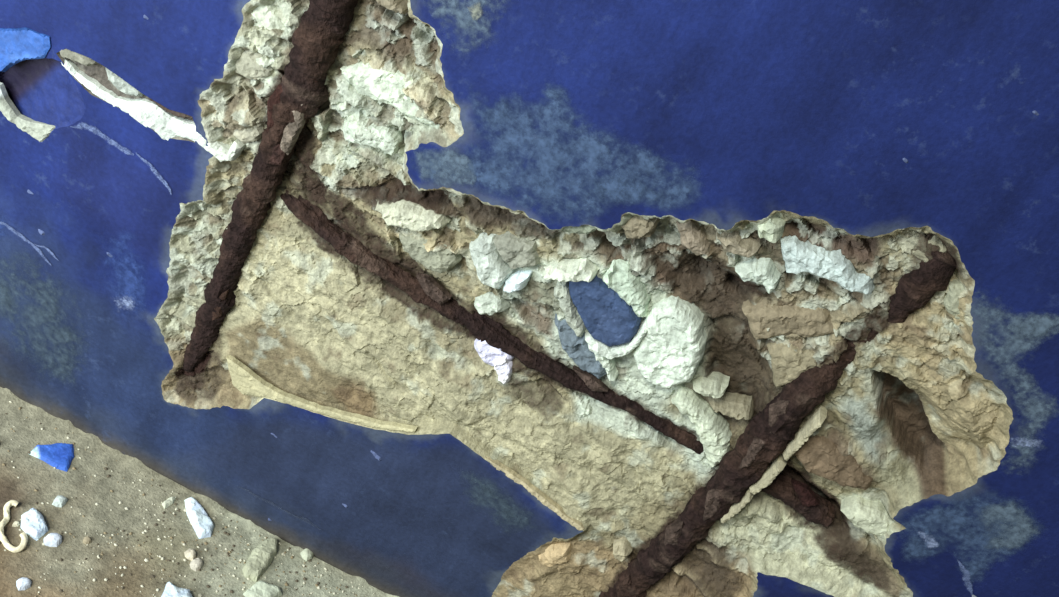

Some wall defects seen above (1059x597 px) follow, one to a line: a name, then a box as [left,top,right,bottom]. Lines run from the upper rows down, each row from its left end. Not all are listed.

spalling [198,0,310,145]
spalling [340,61,440,129]
spalling [343,120,404,155]
rust [174,0,706,455]
spalling [544,258,599,282]
spalling [602,259,651,317]
spalling [780,236,875,294]
spalling [633,295,707,389]
spalling [226,355,418,433]
spalling [671,386,756,468]
rust [599,233,960,597]
crack [958,561,975,597]